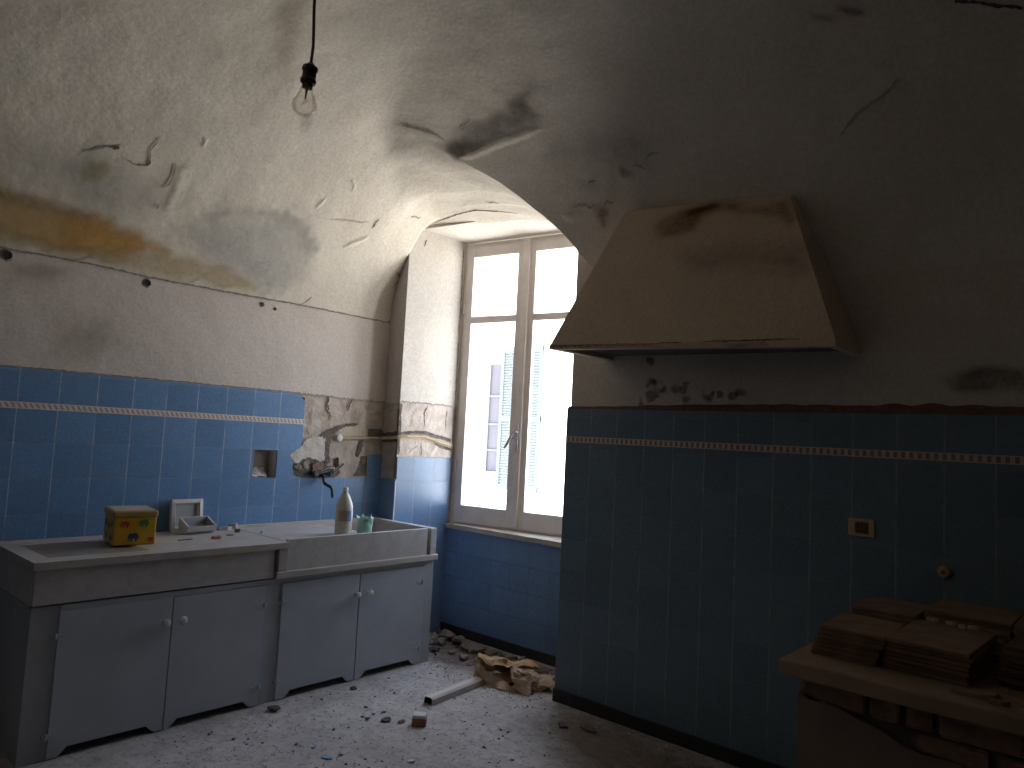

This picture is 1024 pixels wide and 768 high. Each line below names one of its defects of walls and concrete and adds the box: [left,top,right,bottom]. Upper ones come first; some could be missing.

crack [84,140,159,166]
flaking render [568,379,1024,415]
flaking render [290,393,454,480]